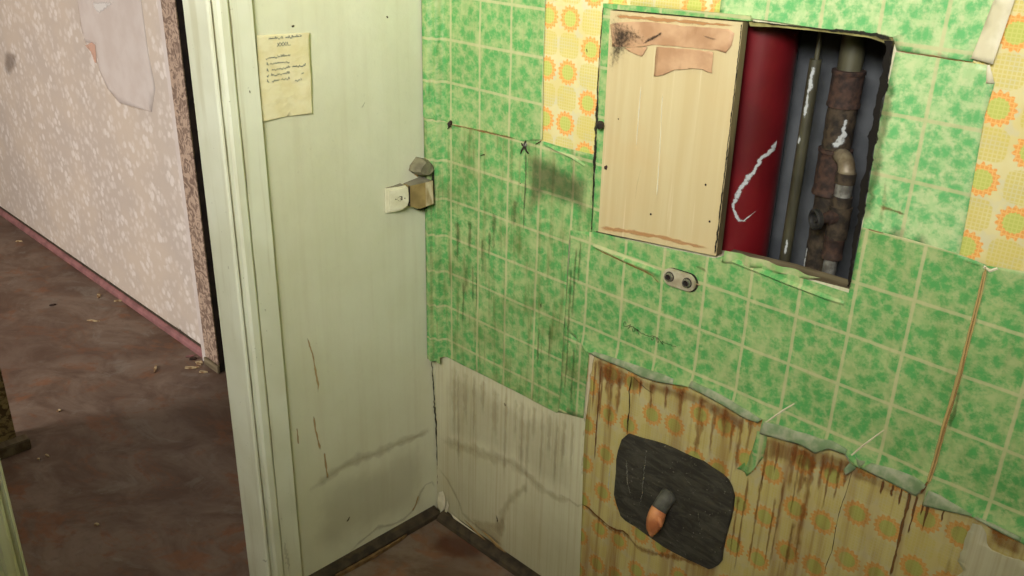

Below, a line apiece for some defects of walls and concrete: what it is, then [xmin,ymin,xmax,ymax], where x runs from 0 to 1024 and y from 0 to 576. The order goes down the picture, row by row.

peeling [78,0,155,112]
leakage [524,10,603,232]
peeling [804,67,815,116]
peeling [833,120,847,147]
peeling [971,0,1015,83]
peeling [583,354,594,435]
rust [880,269,986,575]
peeling [437,491,506,553]
rust [733,442,779,549]
rust [781,448,846,556]